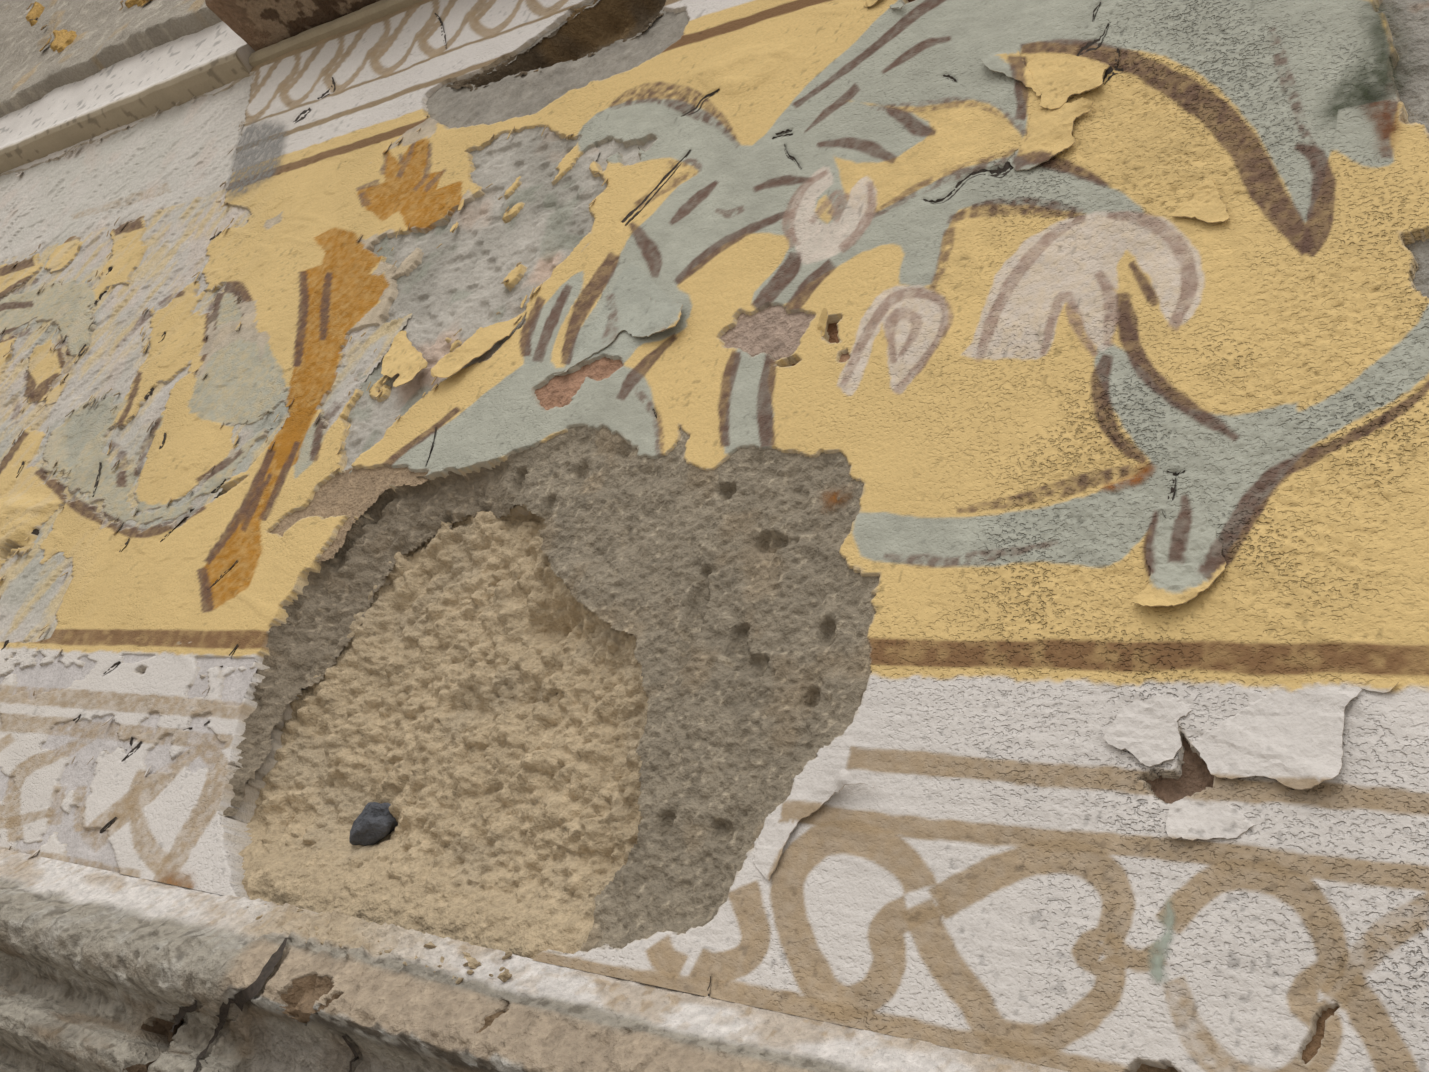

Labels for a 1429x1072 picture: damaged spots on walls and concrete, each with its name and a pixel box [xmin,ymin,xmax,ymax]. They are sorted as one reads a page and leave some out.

crack [1076,2,1123,84]
flaking render [0,0,880,984]
peeling [1103,680,1399,841]
crack [170,938,288,1072]
crack [342,1035,359,1072]
flaking render [1136,1064,1178,1072]